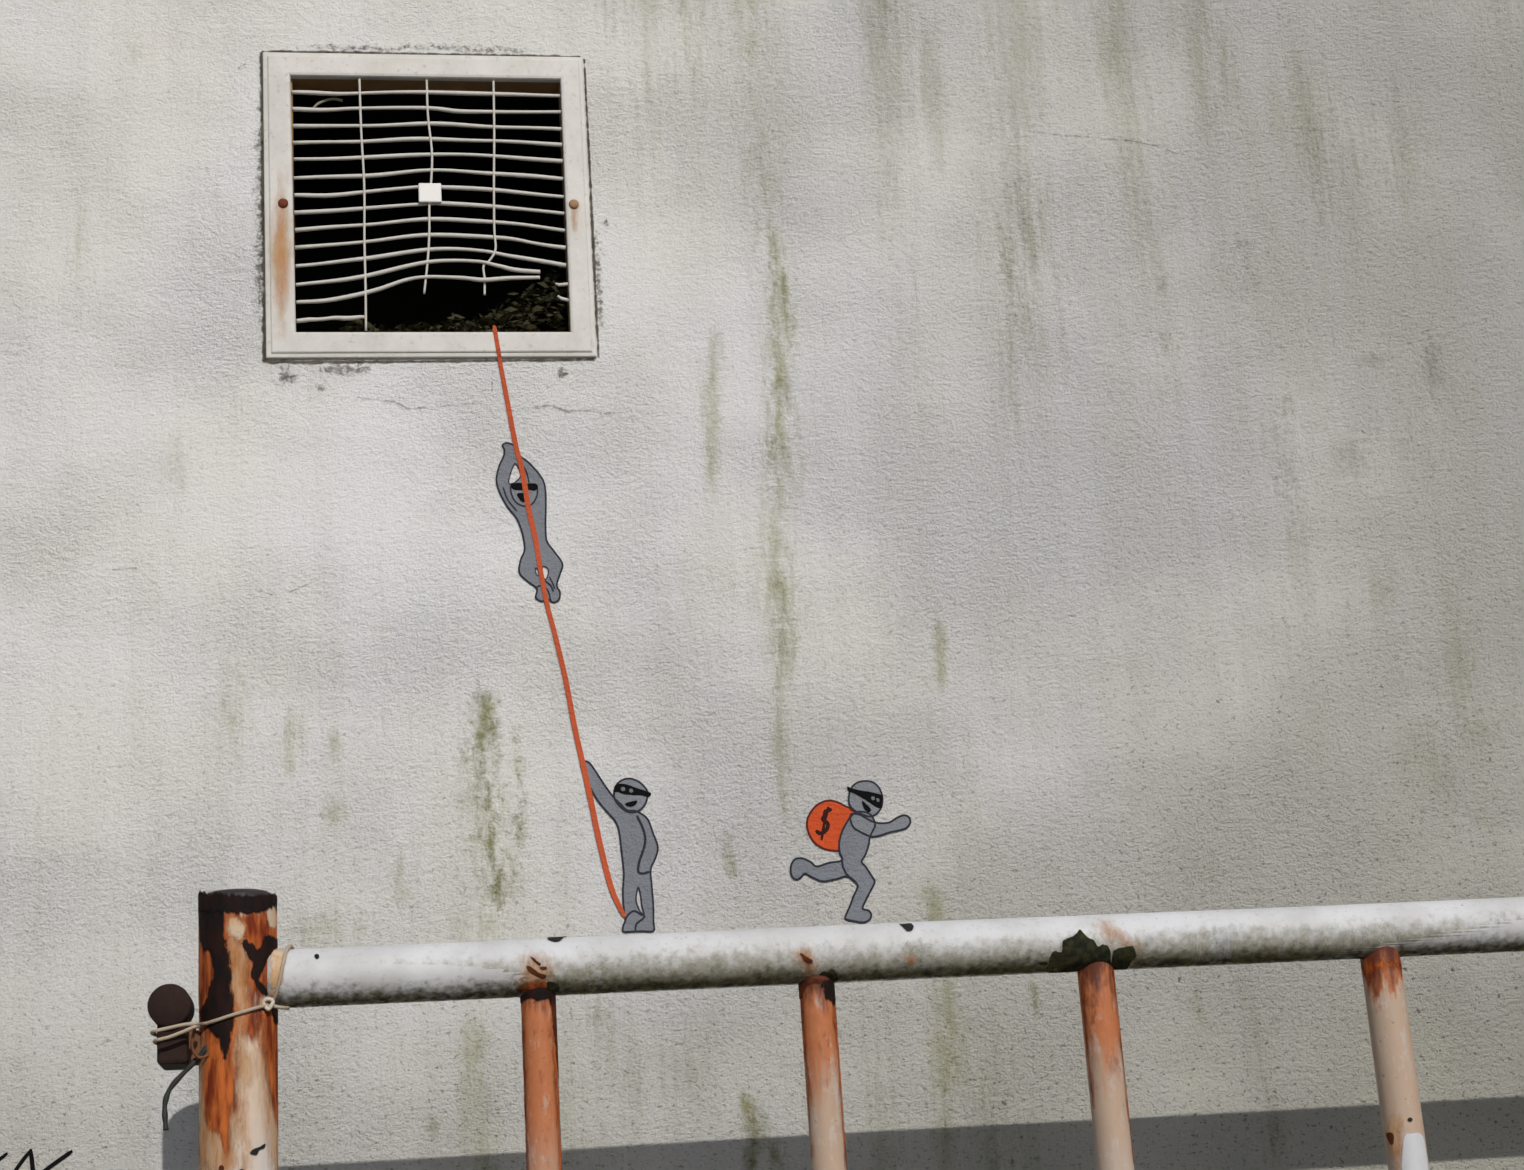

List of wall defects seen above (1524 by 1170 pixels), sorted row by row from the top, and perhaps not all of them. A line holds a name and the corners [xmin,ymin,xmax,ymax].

rust [274,220,288,294]
water stain [477,697,493,740]
rust [198,906,284,1170]